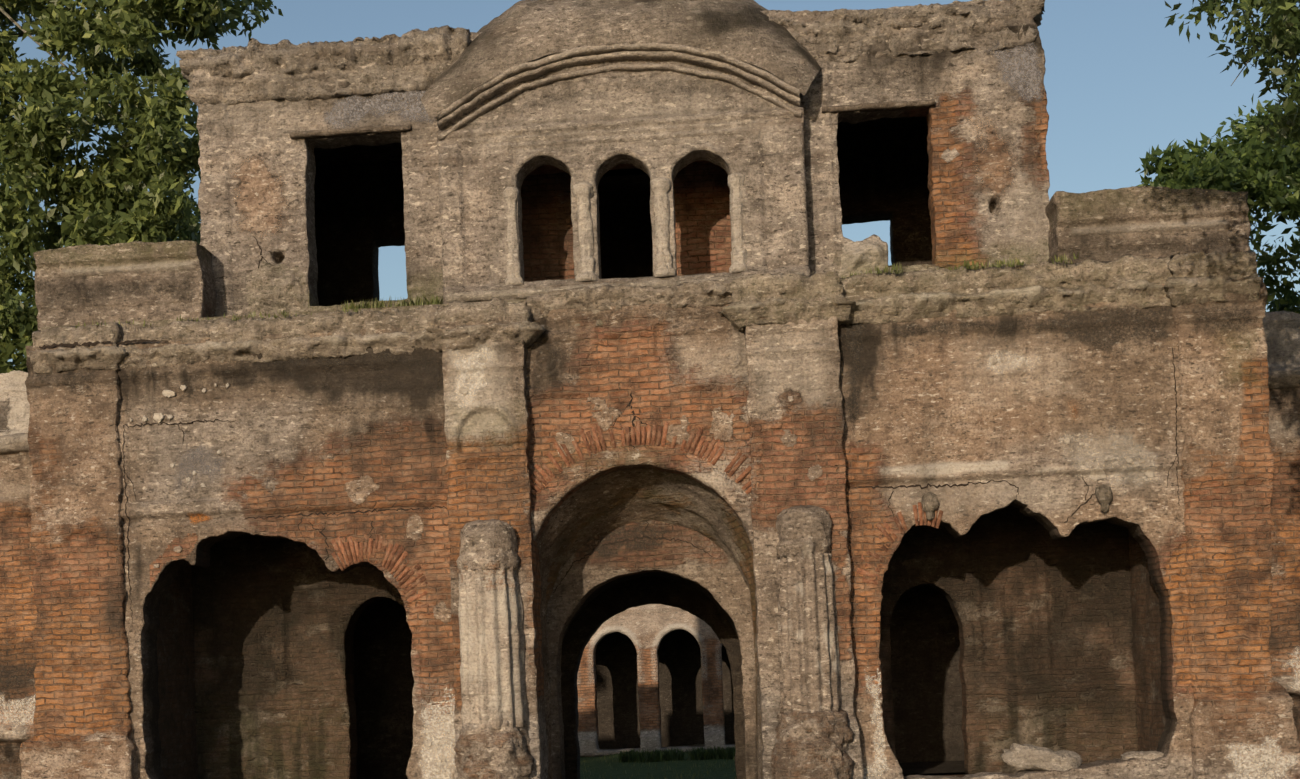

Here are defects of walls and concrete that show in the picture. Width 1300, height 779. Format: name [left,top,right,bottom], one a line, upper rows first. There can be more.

flaking render [932,94,978,267]
flaking render [0,514,128,741]
flaking render [235,324,895,706]
crack [613,385,652,448]
crack [854,480,1019,517]
crack [1065,474,1093,522]
flaking render [1163,463,1300,691]